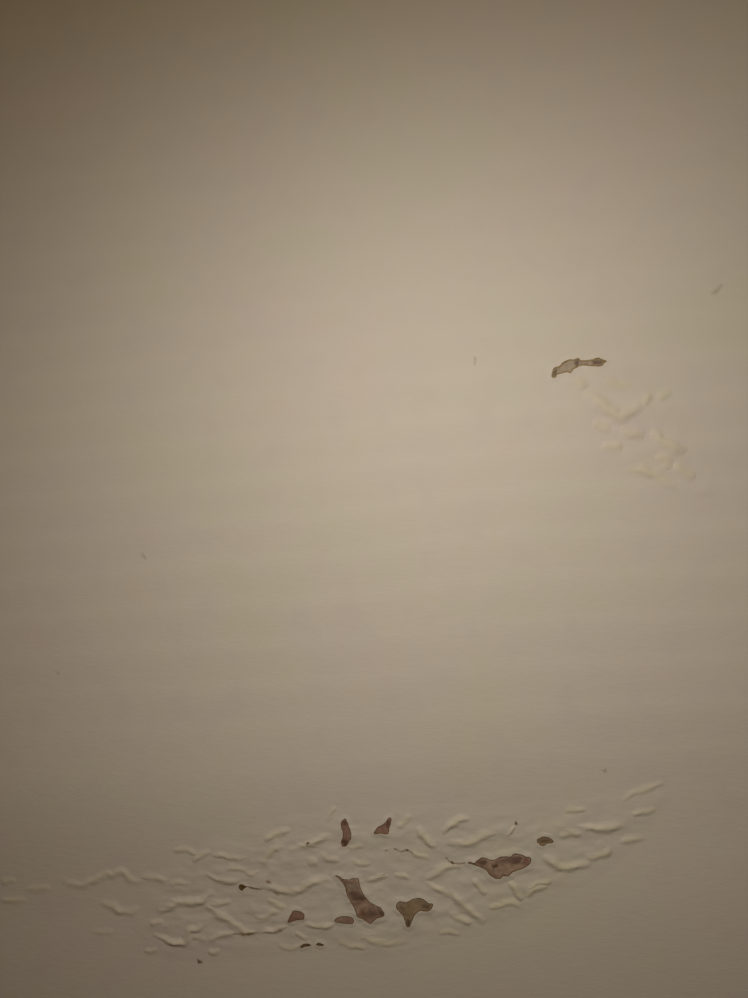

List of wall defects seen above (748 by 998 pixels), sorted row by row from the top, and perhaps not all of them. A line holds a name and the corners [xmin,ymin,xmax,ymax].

peeling [546,352,612,383]
peeling [336,813,357,852]
peeling [369,813,396,839]
peeling [461,832,558,885]
peeling [328,868,439,932]